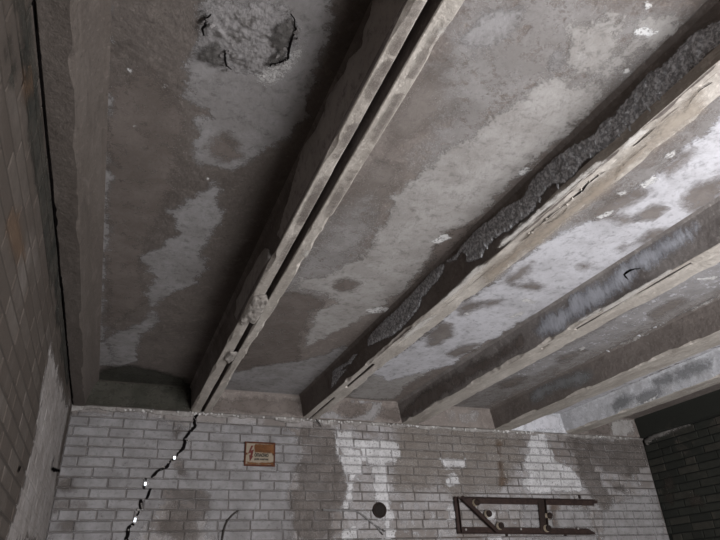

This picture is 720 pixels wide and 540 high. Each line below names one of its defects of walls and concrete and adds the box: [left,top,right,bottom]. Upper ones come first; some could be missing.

crack [31,0,73,399]
leakage [103,67,184,328]
peeling [181,0,337,172]
peeling [284,0,720,418]
leakage [501,162,601,246]
leakage [624,130,647,149]
leakage [634,27,659,38]
leakage [236,292,325,372]
leakage [443,265,487,301]
leakage [581,270,671,320]
crack [124,411,201,540]
leakage [190,335,534,539]